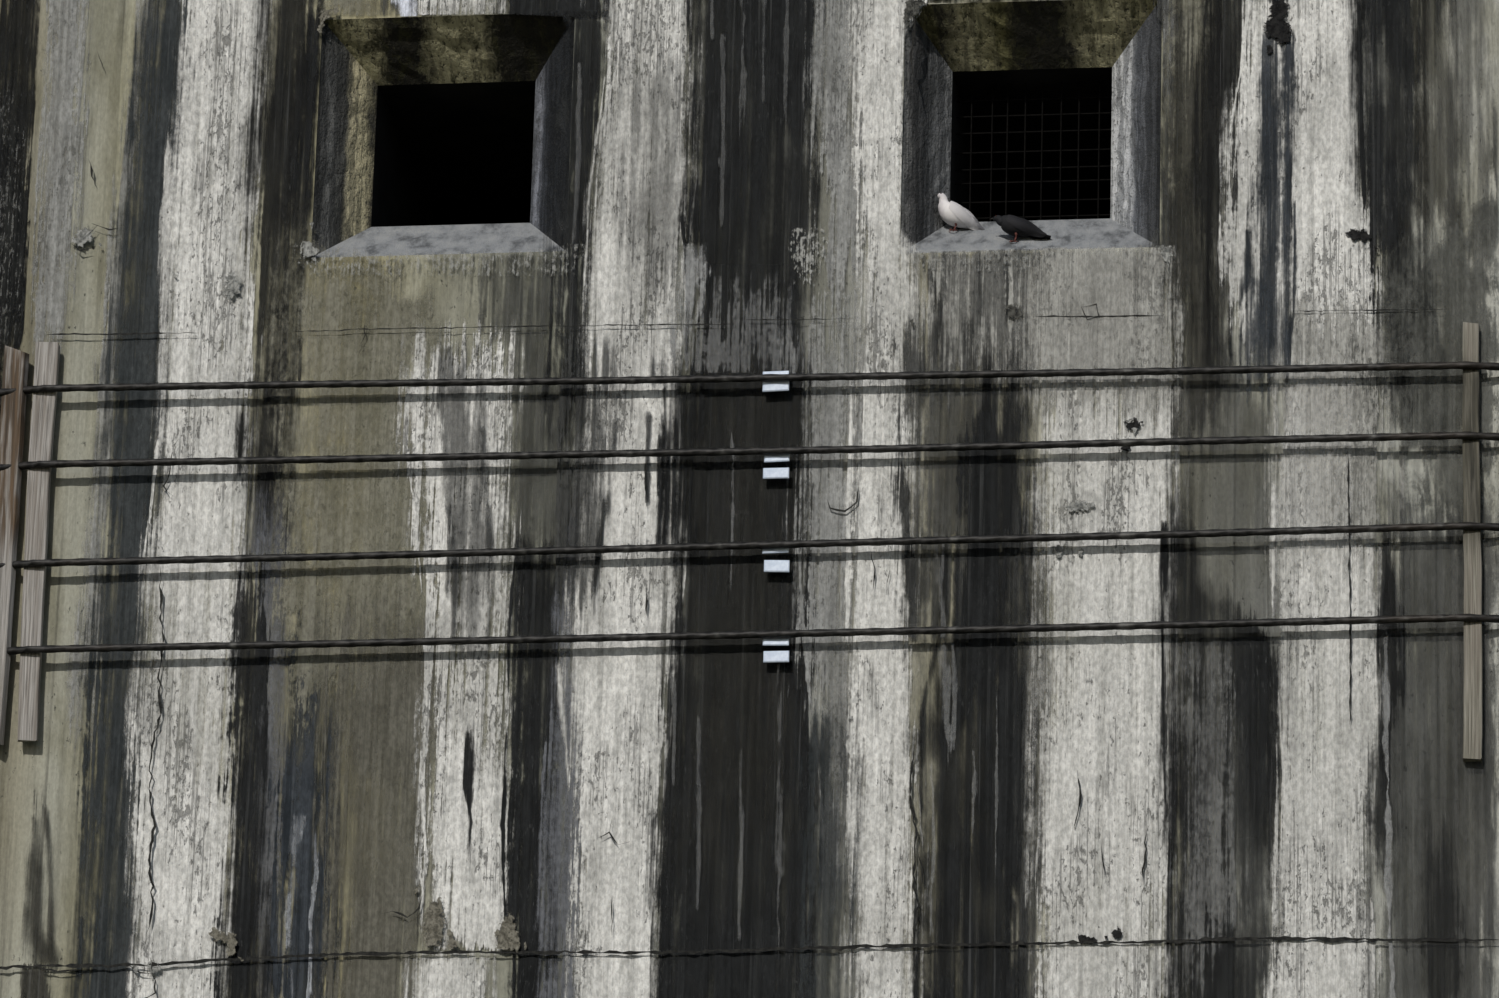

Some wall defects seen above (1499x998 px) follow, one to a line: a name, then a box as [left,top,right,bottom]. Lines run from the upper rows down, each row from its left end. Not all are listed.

water stain [0,0,91,414]
water stain [86,0,1499,558]
water stain [1240,369,1464,619]
water stain [20,790,56,998]
water stain [68,530,1499,998]